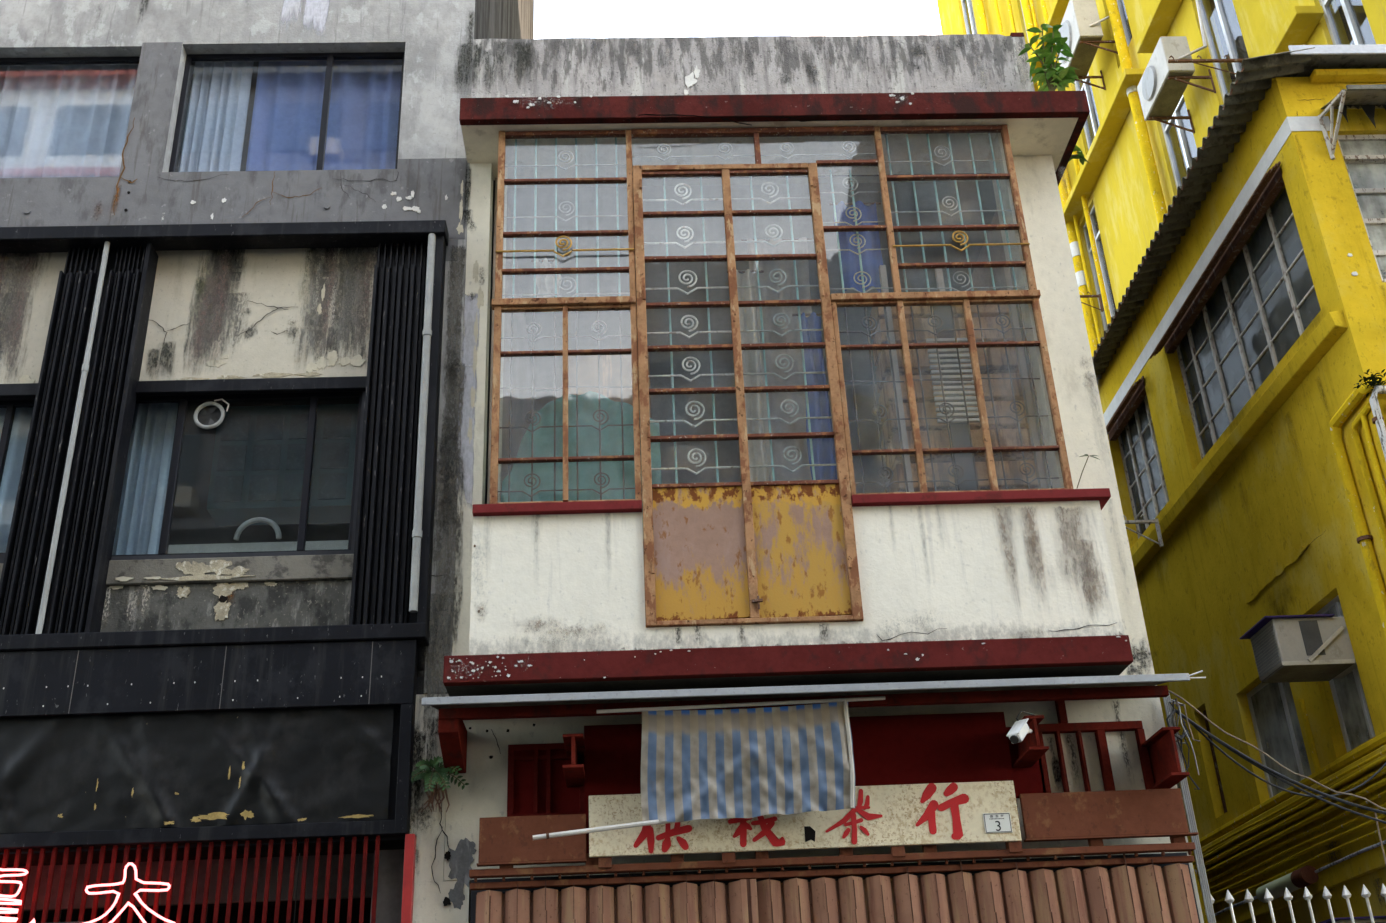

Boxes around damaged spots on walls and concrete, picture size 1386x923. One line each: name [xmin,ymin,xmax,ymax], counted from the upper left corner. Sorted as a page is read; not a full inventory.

peeling [280,0,330,32]
damp [455,13,532,85]
damp [0,253,50,375]
damp [147,249,254,373]
damp [287,247,376,359]
spalling [109,560,277,621]
damp [410,246,485,829]
damp [997,508,1016,579]
damp [1024,508,1043,579]
damp [1057,507,1099,601]
peeling [447,656,533,680]
peeling [448,837,477,910]